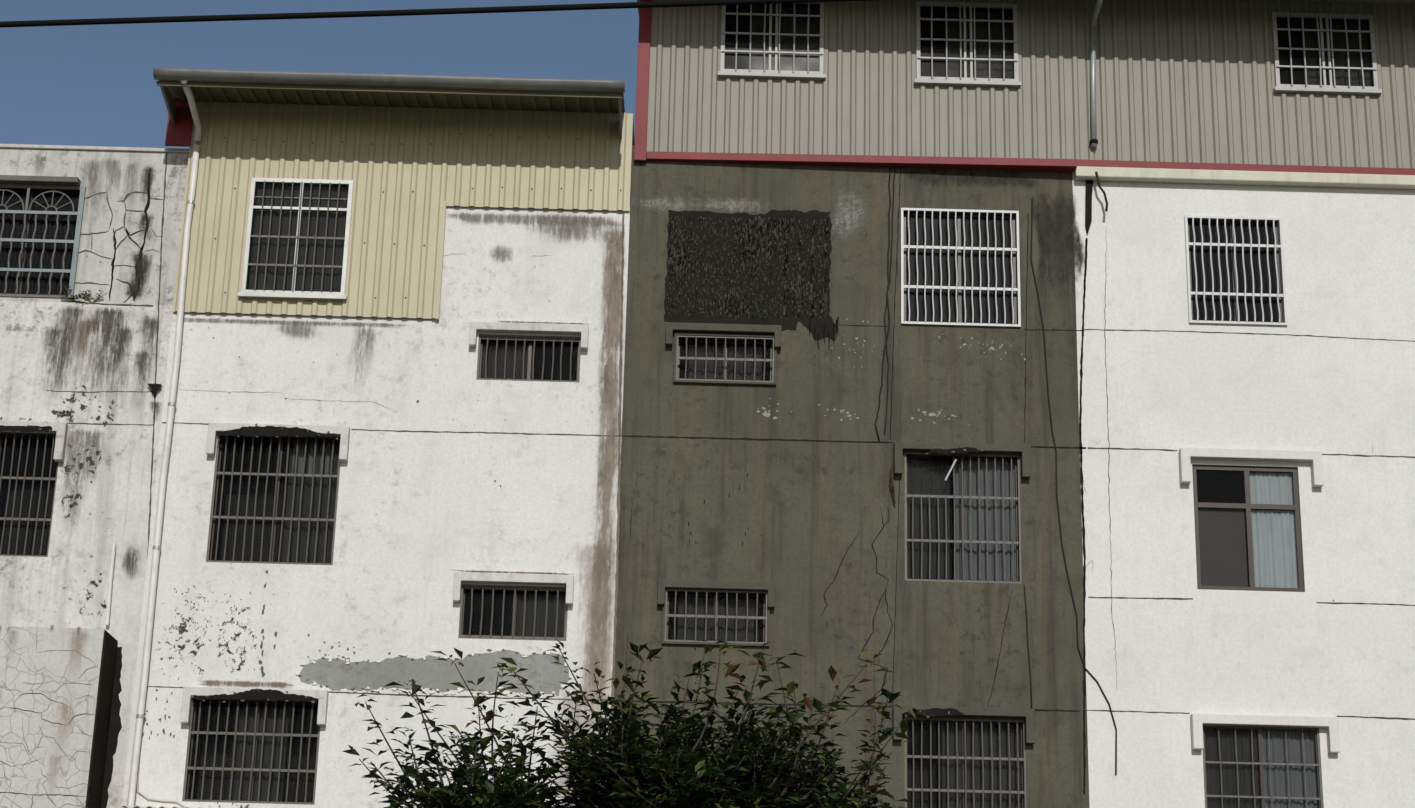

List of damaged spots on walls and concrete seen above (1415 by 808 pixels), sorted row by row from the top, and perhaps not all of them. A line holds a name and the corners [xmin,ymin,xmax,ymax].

leakage [51,385,117,518]
leakage [46,307,162,410]
leakage [127,253,149,297]
crack [47,153,901,724]
leakage [453,213,621,686]
crack [0,626,98,808]
spalling [143,570,571,740]